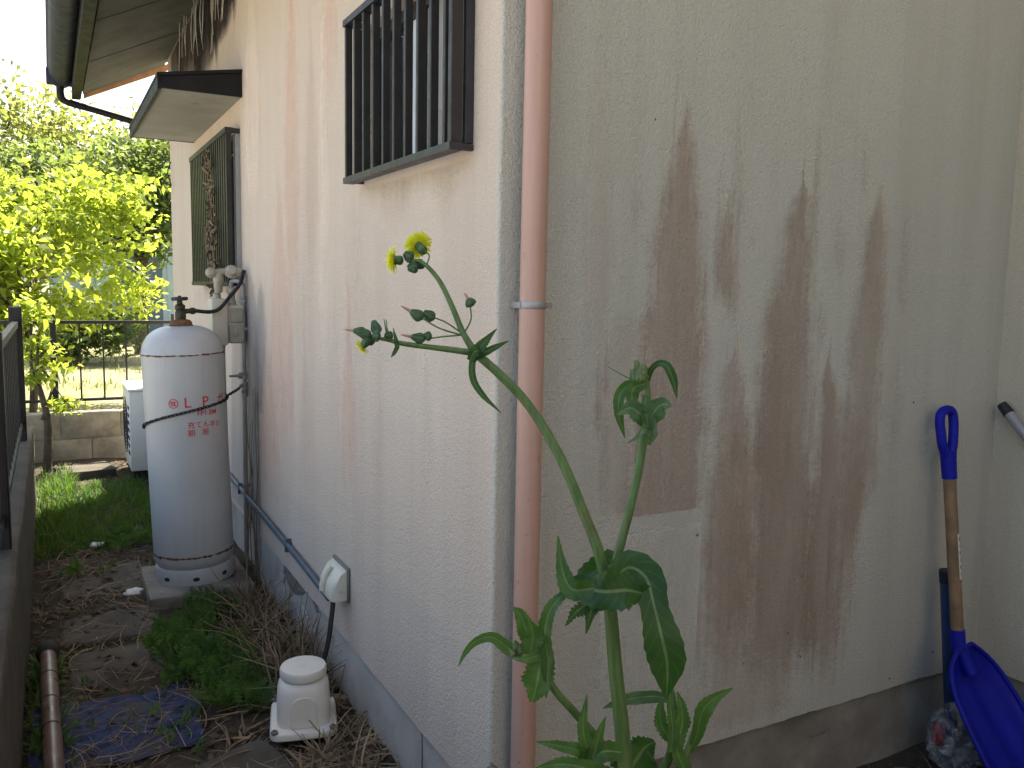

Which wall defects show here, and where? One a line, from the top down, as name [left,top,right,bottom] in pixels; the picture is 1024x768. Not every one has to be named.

damp [638,228,700,516]